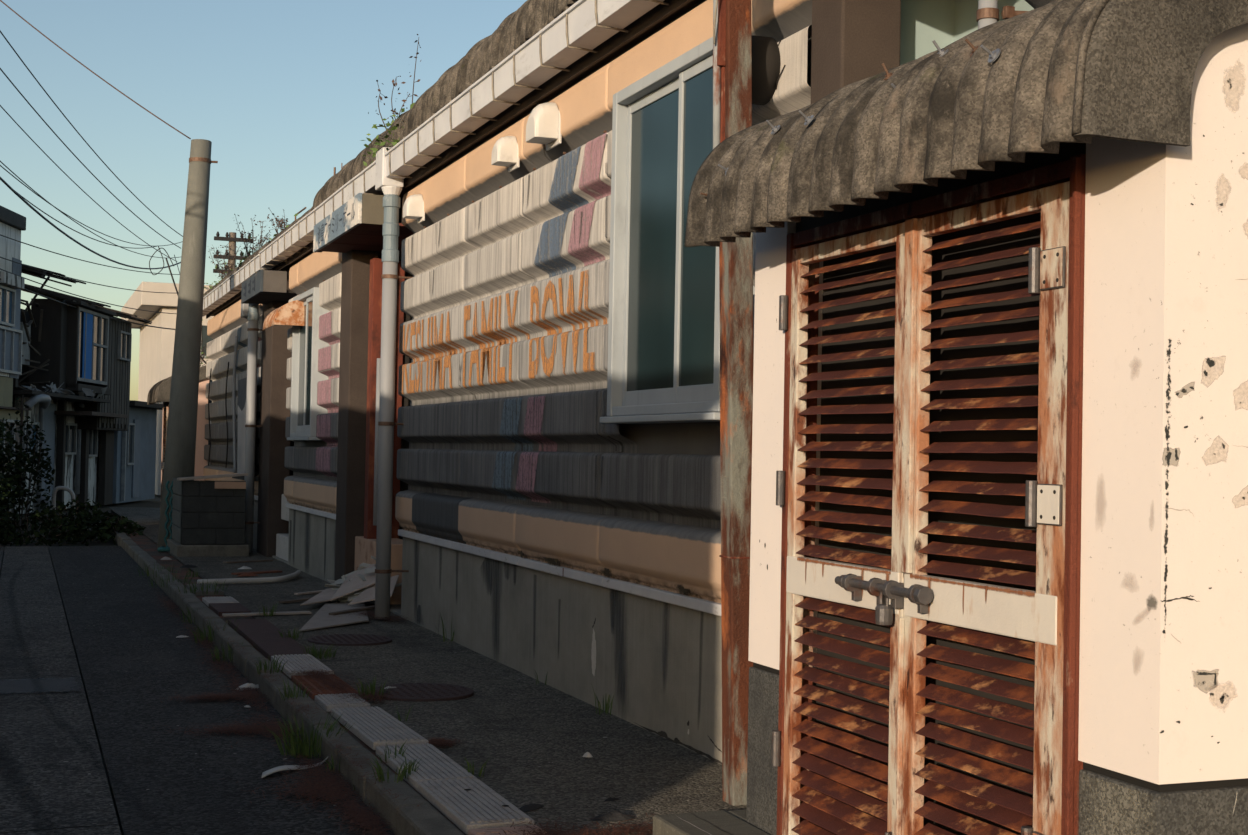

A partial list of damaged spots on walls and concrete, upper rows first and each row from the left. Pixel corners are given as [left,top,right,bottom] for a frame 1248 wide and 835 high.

peeling [1176,356,1226,398]
peeling [1233,381,1248,410]
peeling [1202,436,1228,465]
peeling [1233,486,1248,508]
rust [797,557,891,595]
rust [910,574,1035,612]
crack [1161,594,1200,602]
peeling [1193,669,1236,707]